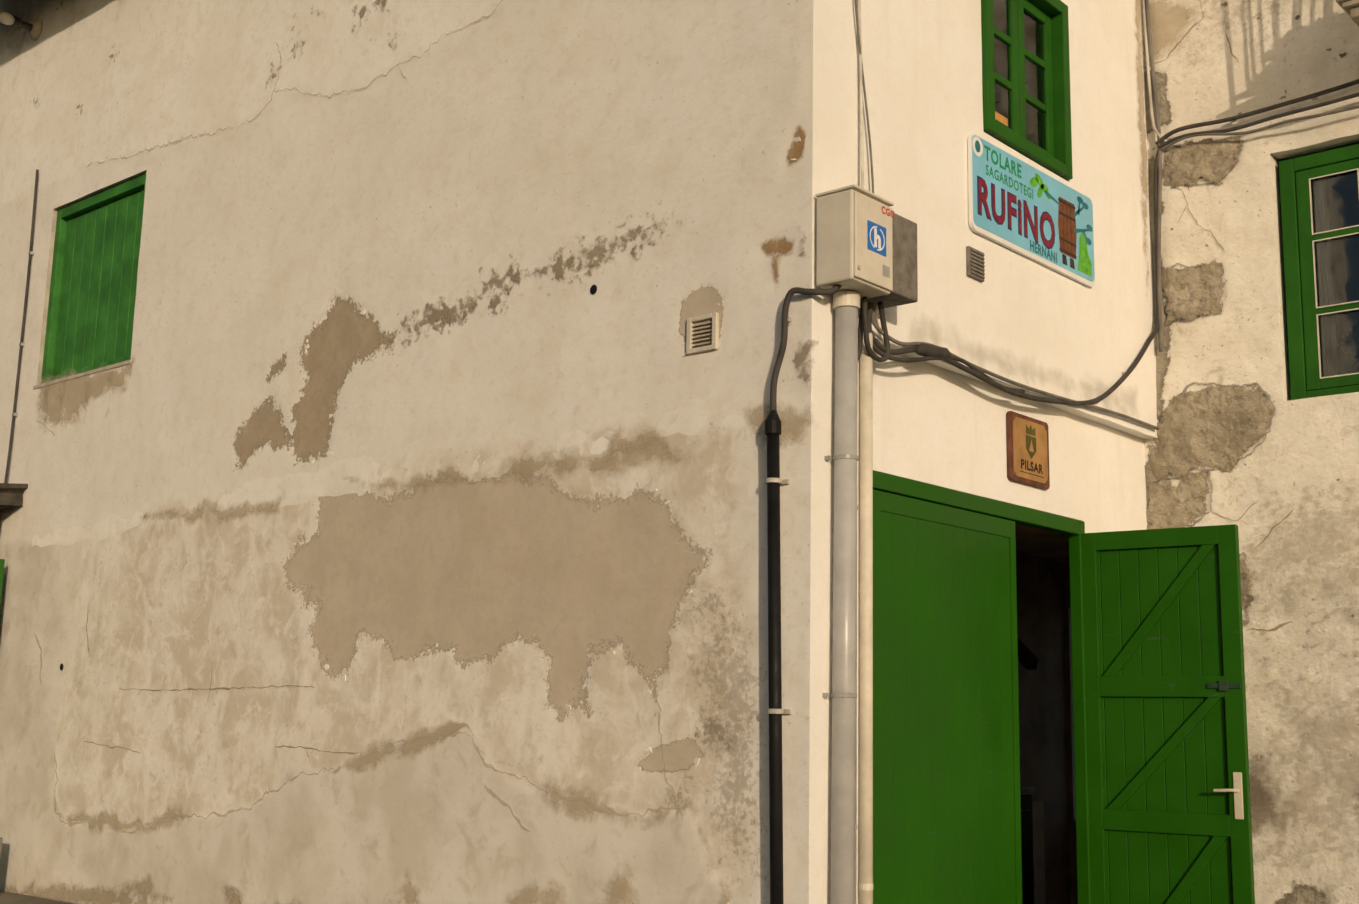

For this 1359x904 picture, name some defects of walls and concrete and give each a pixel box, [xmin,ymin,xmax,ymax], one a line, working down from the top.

crack [88,5,498,166]
flaking render [787,127,805,164]
flaking render [1144,71,1173,139]
peeling [233,295,397,469]
flaking render [1145,136,1275,530]
peeling [283,460,711,722]
peeling [638,737,704,773]
flaking render [1276,881,1340,904]